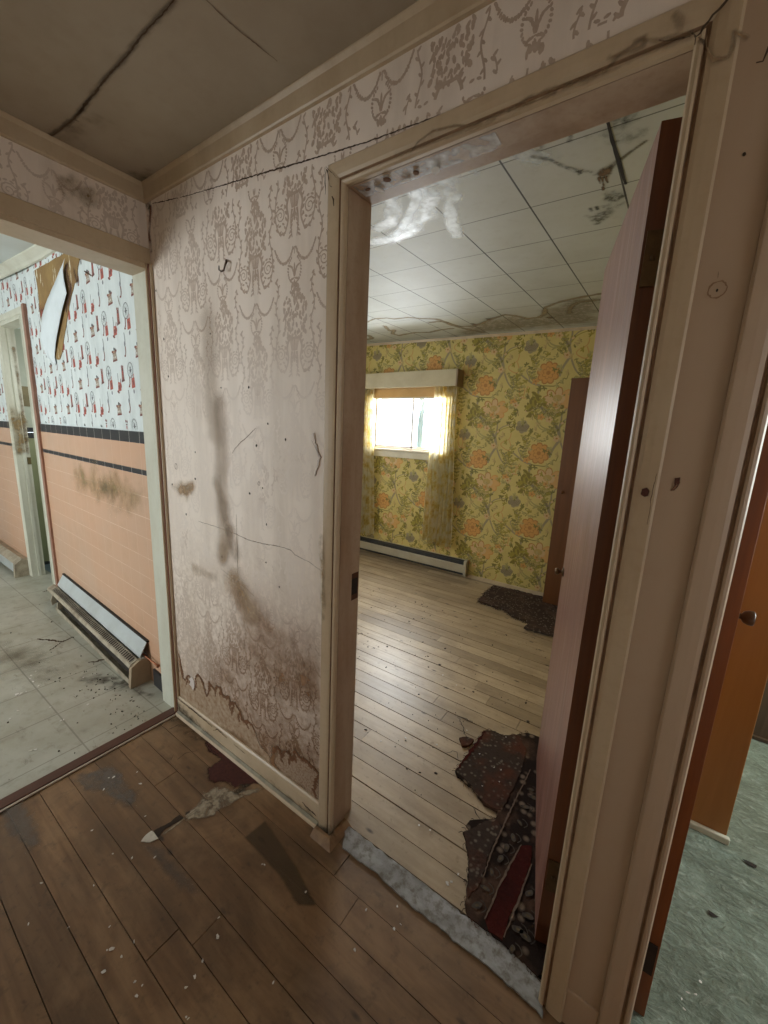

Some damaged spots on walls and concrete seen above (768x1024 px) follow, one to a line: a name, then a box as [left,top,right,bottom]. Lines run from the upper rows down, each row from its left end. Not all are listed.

crack [49,0,174,136]
damp [413,13,748,149]
crack [152,114,440,206]
damp [370,187,461,245]
damp [590,140,647,224]
damp [368,293,600,336]
damp [178,483,194,495]
damp [231,574,316,699]
peeling [179,660,250,729]
damp [205,740,262,794]